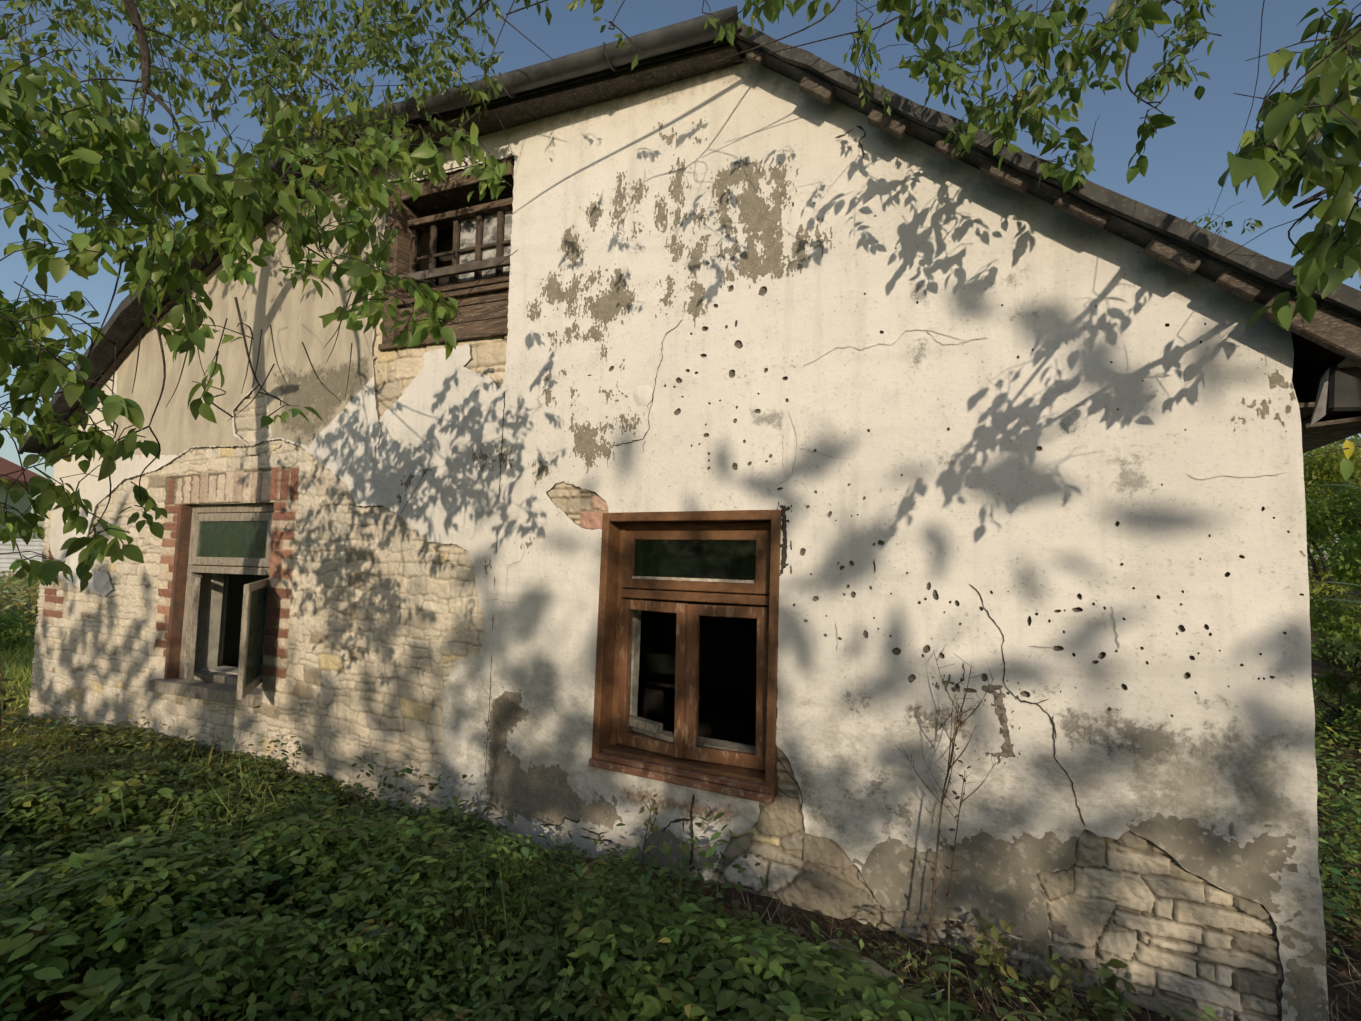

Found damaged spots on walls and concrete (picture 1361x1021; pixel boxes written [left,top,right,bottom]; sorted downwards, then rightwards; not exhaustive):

crack [614,319,683,451]
peeling [526,119,835,473]
crack [805,329,983,365]
spalling [28,183,507,815]
spalling [465,439,608,539]
leakage [909,707,966,738]
crack [971,585,1085,826]
leakage [1062,709,1284,822]
spalling [481,687,1329,1021]